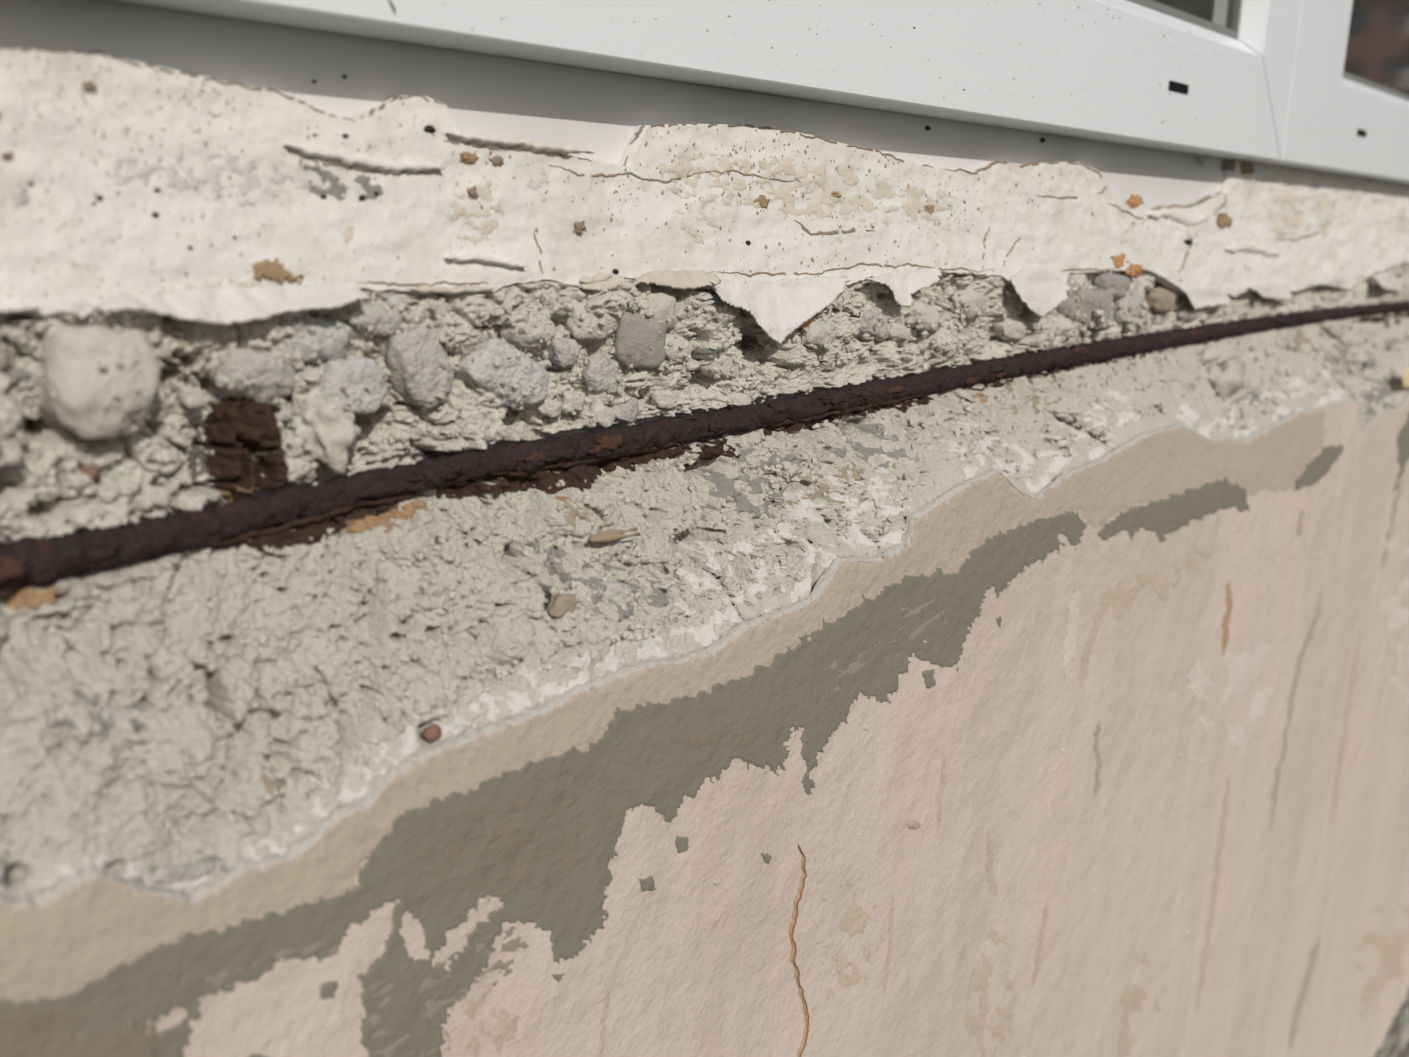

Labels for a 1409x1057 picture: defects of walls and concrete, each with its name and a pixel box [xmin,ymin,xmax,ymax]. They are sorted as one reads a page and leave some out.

rust [1353,312,1409,328]
rust [195,396,289,502]
rust [763,396,934,436]
rust [959,353,1146,403]
rust [211,435,741,554]
rust [1,582,65,611]
rust [1222,580,1233,656]
spalling [0,262,1409,1057]
crack [791,846,810,1057]